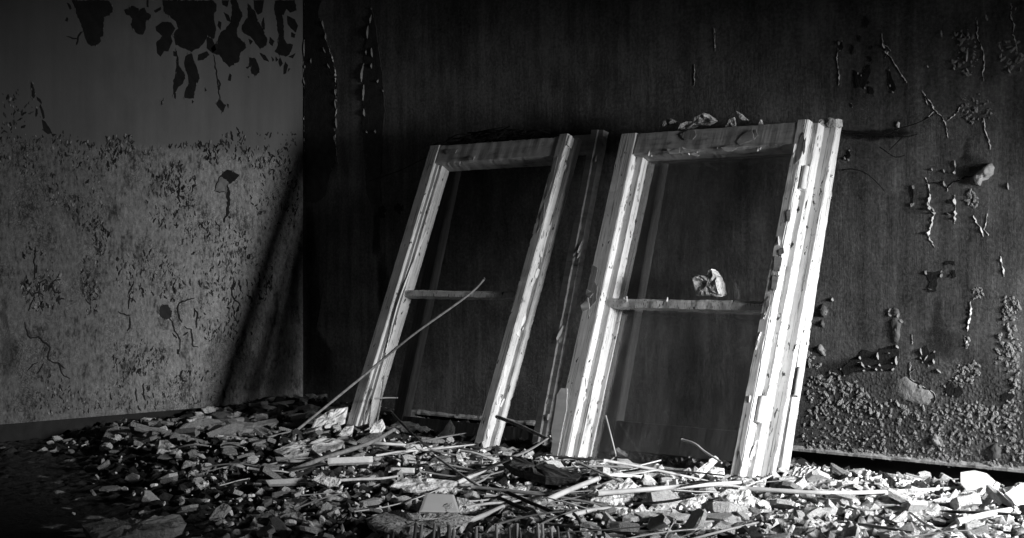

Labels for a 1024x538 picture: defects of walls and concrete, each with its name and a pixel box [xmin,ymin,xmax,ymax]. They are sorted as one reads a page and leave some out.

peeling [360,15,373,116]
peeling [941,29,978,77]
peeling [0,0,338,343]
flaking render [964,188,979,208]
crack [24,254,70,379]
flaking render [925,261,957,292]
flaking render [789,296,1024,473]